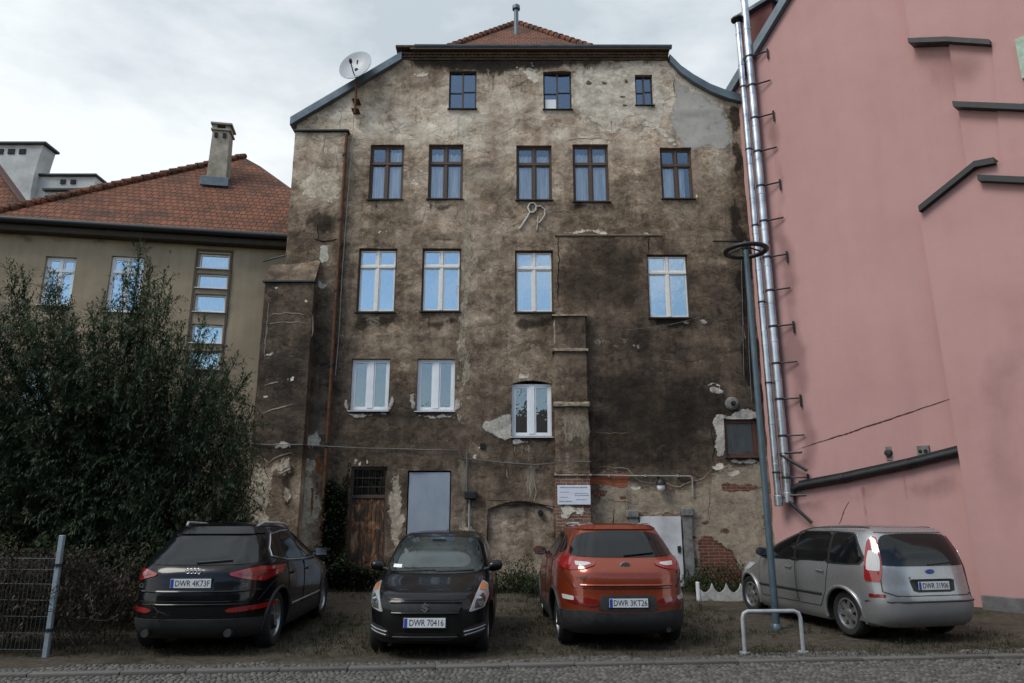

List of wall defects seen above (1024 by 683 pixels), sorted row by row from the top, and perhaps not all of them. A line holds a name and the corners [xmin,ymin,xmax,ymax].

flaking render [245,441,294,527]
peeling [387,476,405,551]
flaking render [560,458,766,589]